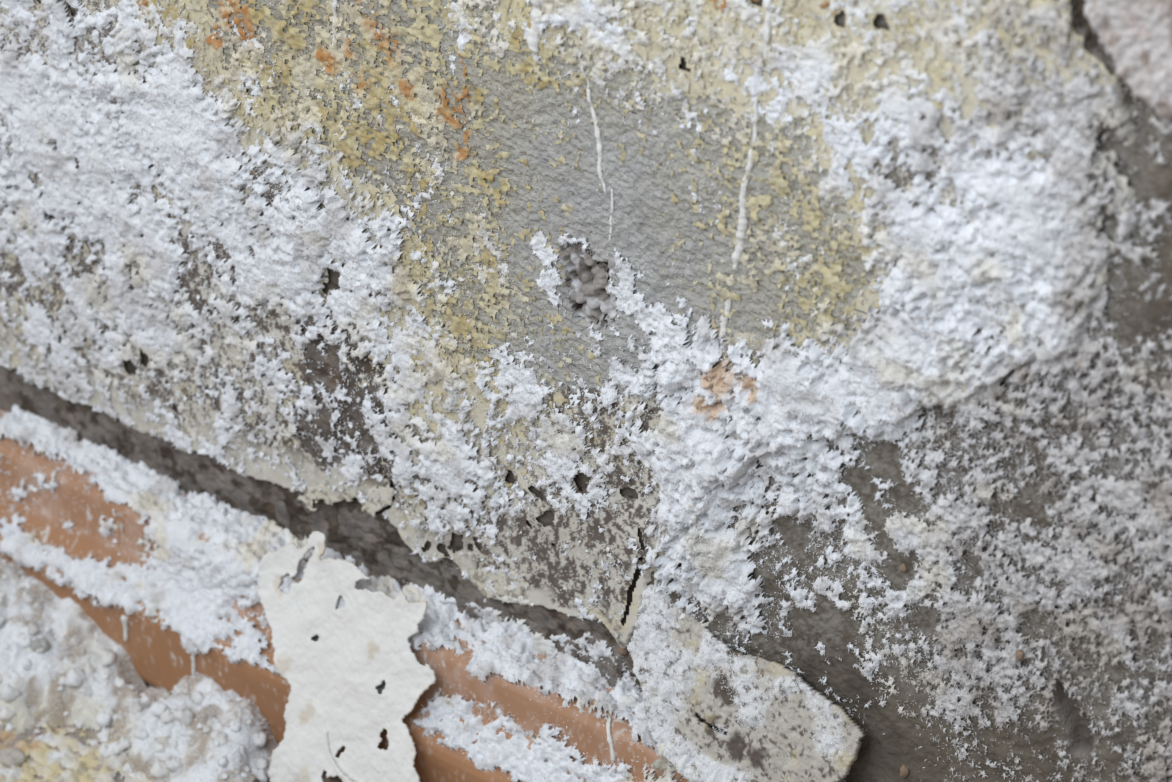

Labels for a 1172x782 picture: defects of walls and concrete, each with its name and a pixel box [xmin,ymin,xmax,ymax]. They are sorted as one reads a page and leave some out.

crack [1073,0,1137,106]
leakage [545,101,584,148]
leakage [635,118,710,214]
peeling [962,0,1138,323]
leakage [558,227,599,257]
peeling [0,0,993,688]
peeling [971,271,1056,370]
leakage [0,405,698,782]
crack [626,532,644,615]
leakage [818,671,867,731]
leakage [1033,728,1107,782]